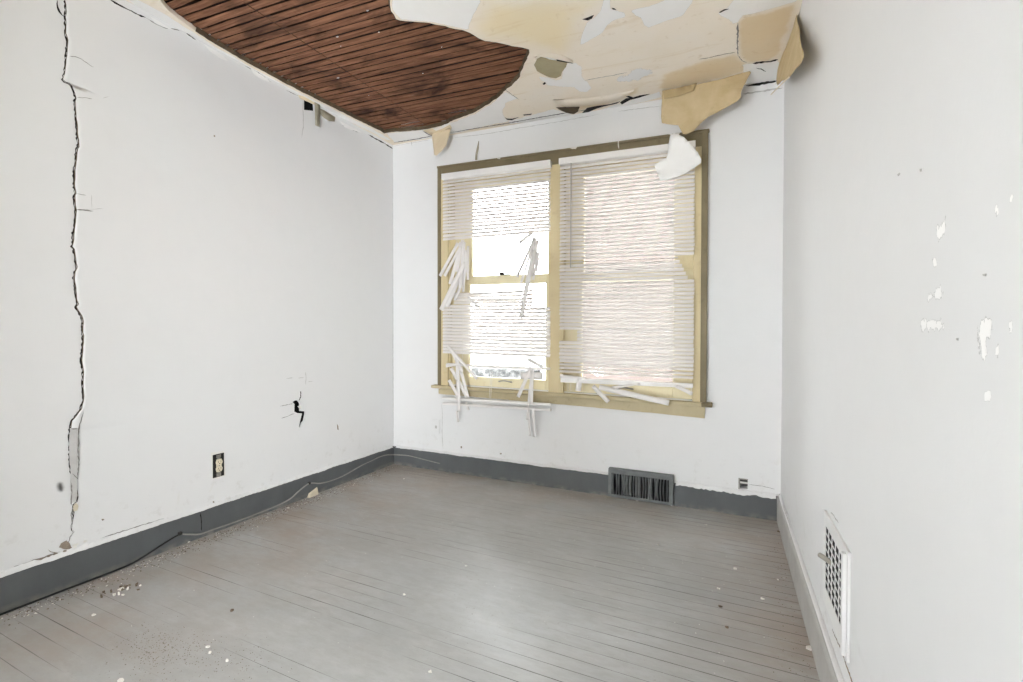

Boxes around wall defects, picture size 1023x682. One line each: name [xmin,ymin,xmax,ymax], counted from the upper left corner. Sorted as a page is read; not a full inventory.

peeling [580,0,693,44]
peeling [719,0,797,24]
peeling [128,0,571,142]
peeling [539,63,591,92]
peeling [742,60,780,85]
crack [14,0,106,567]
peeling [0,445,608,578]